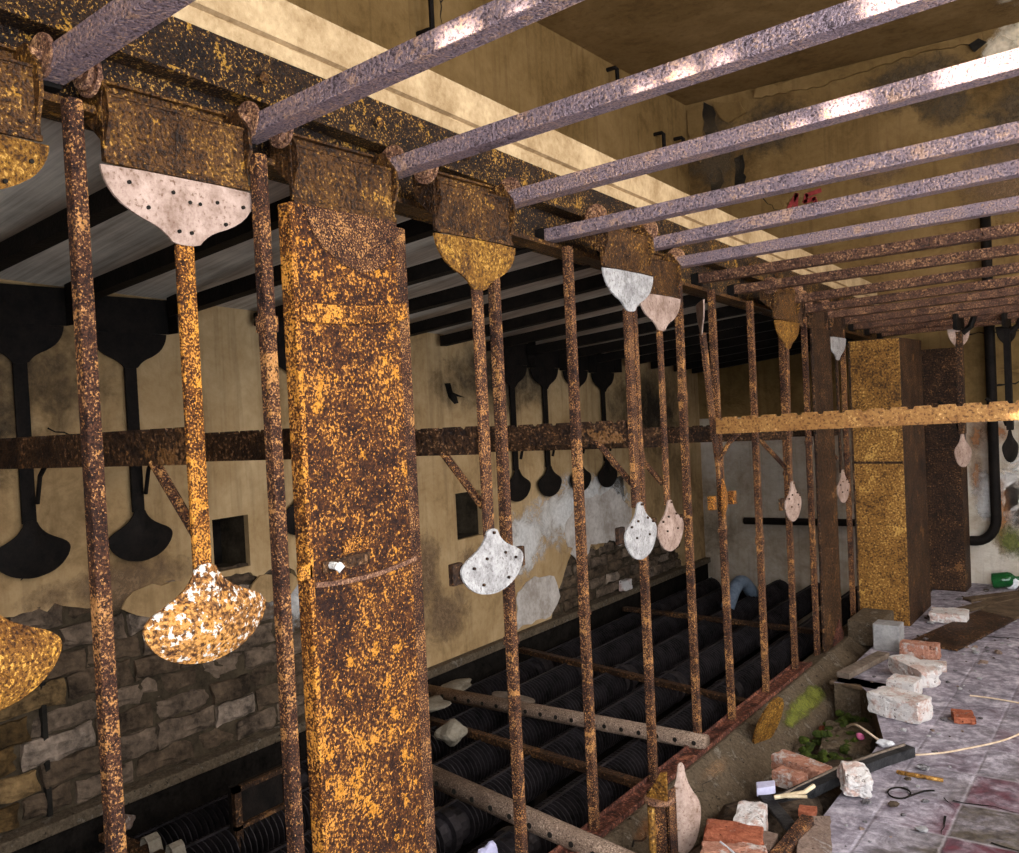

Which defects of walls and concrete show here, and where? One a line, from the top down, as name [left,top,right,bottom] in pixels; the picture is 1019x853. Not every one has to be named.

spalling [516,488,681,630]
corrosion [998,492,1007,537]
peeling [1004,480,1019,521]
spalling [0,603,102,833]
spalling [112,563,280,785]
spalling [289,569,305,716]